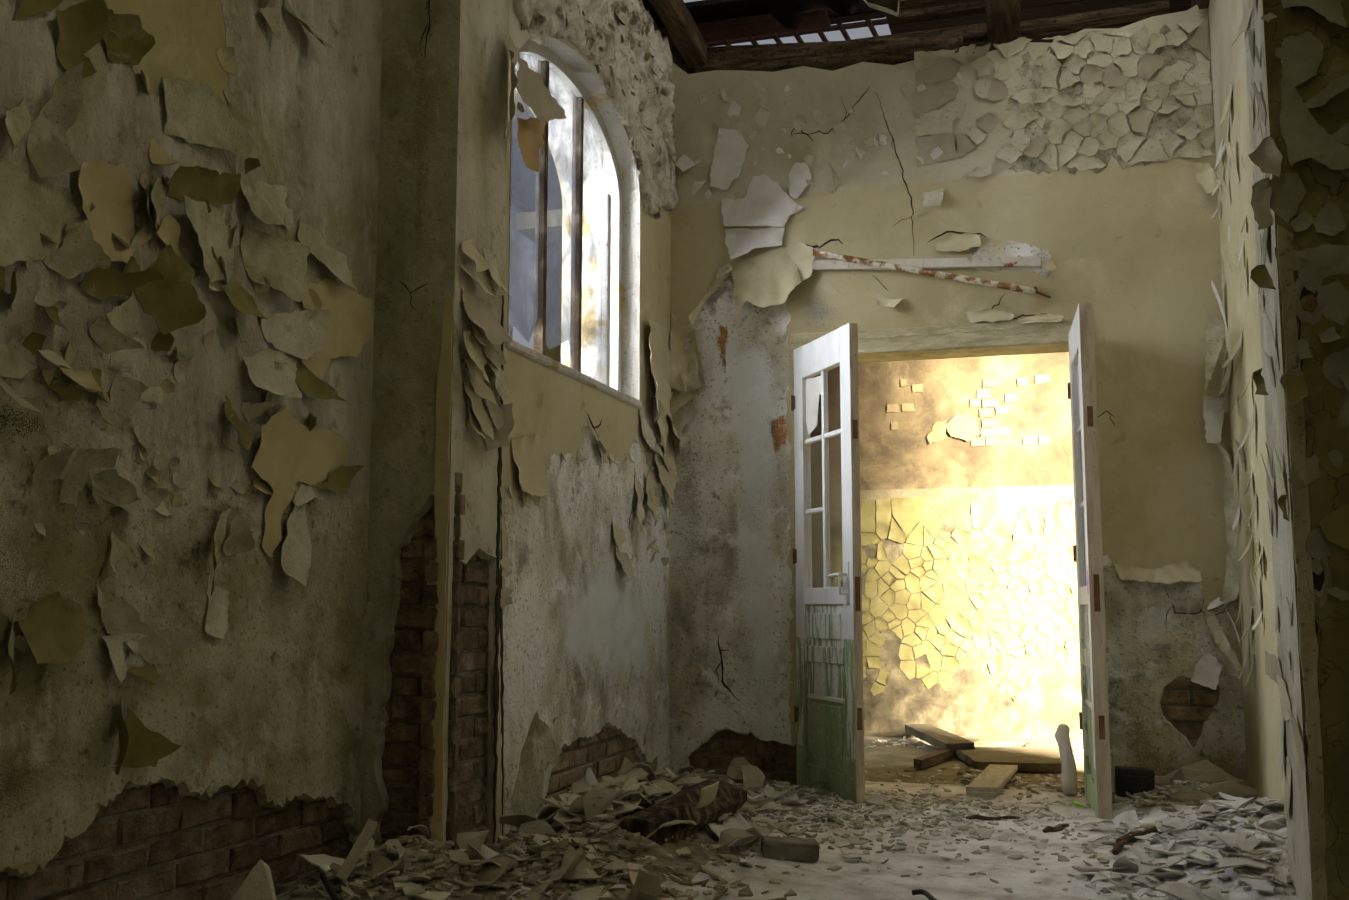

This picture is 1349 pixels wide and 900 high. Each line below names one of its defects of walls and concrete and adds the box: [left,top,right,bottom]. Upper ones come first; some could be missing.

crack [420,0,431,58]
crack [786,87,987,252]
peeling [874,293,904,307]
peeling [0,0,815,900]
flaking render [886,378,923,430]
peeling [913,0,1349,820]
peeling [832,501,843,587]
peeling [860,494,1080,701]